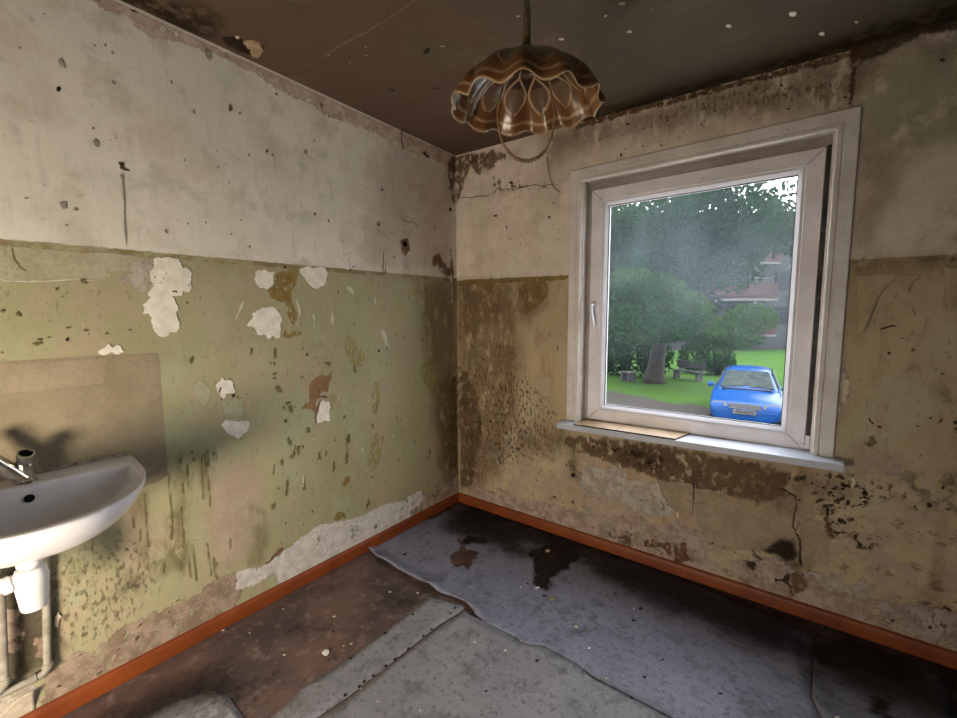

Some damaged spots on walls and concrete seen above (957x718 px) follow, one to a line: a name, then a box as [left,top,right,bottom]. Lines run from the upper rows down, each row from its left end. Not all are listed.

peeling [93,0,473,186]
water stain [575,3,957,130]
water stain [448,149,506,203]
crack [461,178,558,217]
water stain [446,366,482,487]
water stain [168,453,214,542]
peeling [0,474,459,718]
water stain [446,507,957,718]
peeling [477,467,957,651]
crack [778,488,802,565]